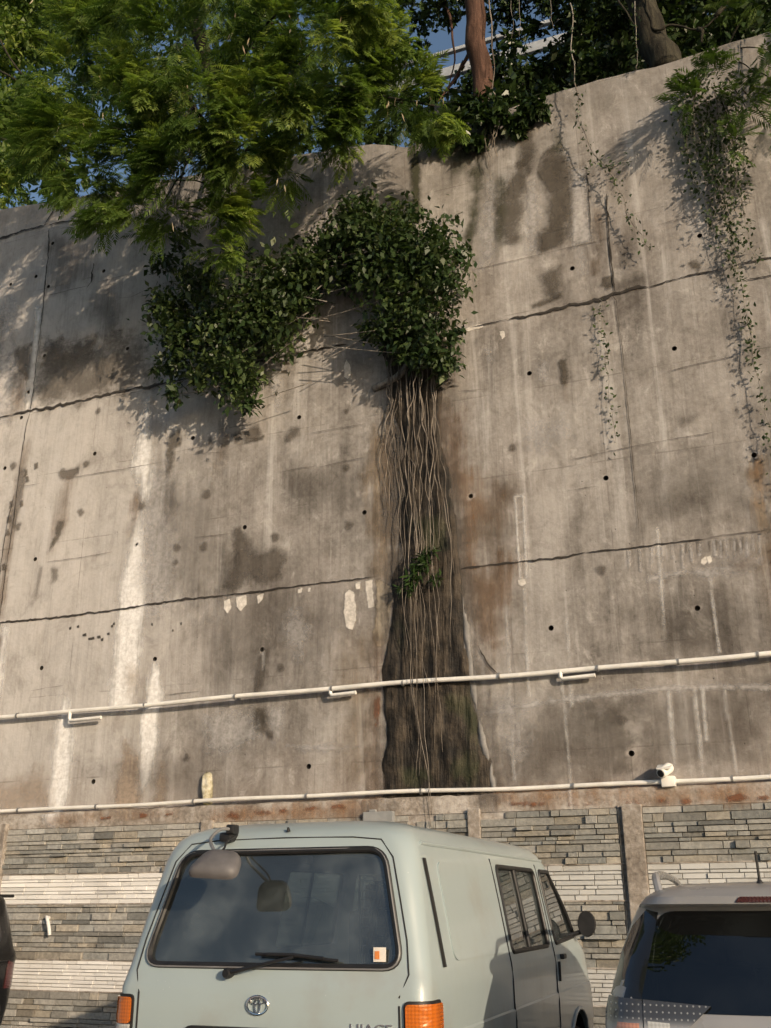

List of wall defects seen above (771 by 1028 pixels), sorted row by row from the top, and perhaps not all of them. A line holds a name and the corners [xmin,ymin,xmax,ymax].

leakage [465,127,591,257]
leakage [533,265,562,307]
leakage [233,426,264,442]
leakage [226,528,286,588]
spalling [224,594,264,613]
spalling [343,579,392,647]
rust [225,807,315,821]
rust [714,791,769,802]